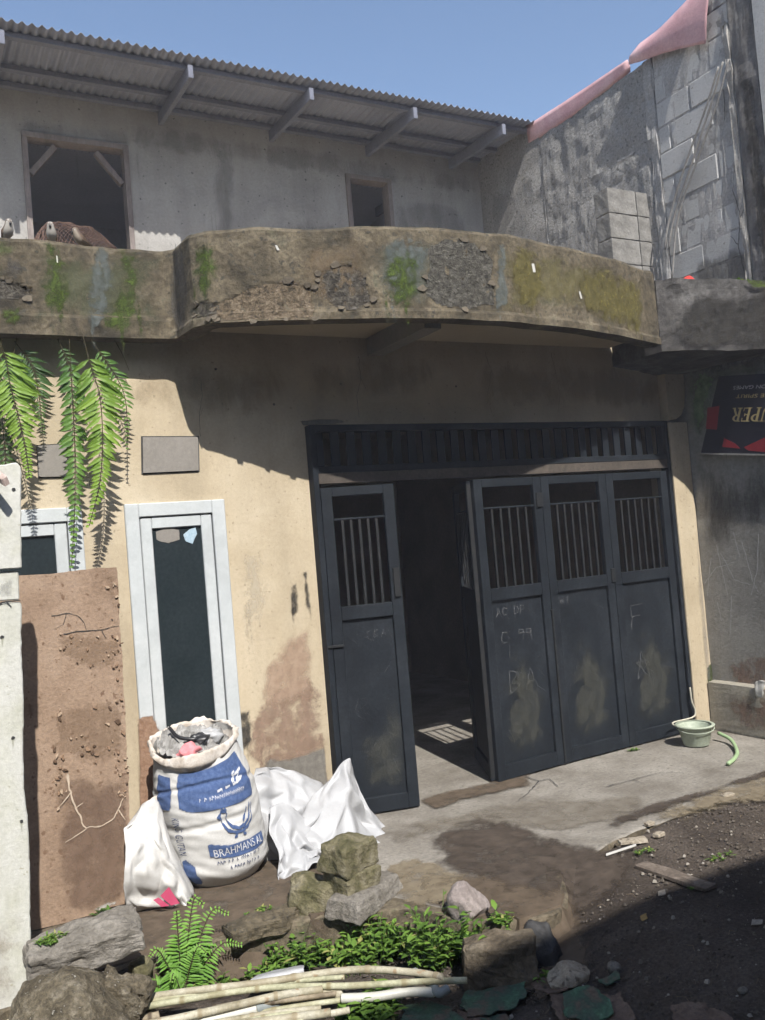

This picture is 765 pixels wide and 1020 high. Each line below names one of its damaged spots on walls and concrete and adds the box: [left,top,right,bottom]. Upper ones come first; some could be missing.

leakage [738,69,765,264]
spalling [0,276,35,302]
spalling [191,261,378,324]
spalling [417,237,496,312]
leakage [676,291,765,348]
leakage [697,252,747,279]
peeling [252,634,327,785]
crack [58,774,126,843]